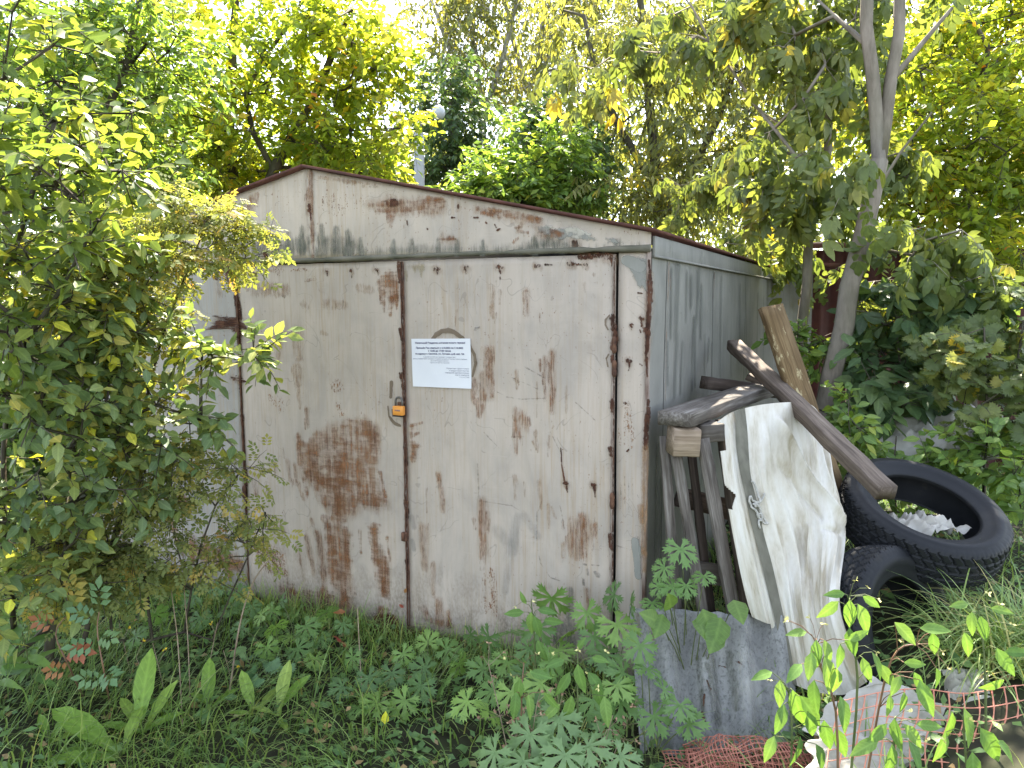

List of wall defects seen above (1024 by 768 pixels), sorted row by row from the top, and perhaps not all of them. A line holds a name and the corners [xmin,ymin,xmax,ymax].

rust [306,182,442,240]
rust [477,207,541,234]
rust [554,231,645,371]
rust [375,261,423,485]
rust [608,377,634,494]
rust [287,405,409,639]